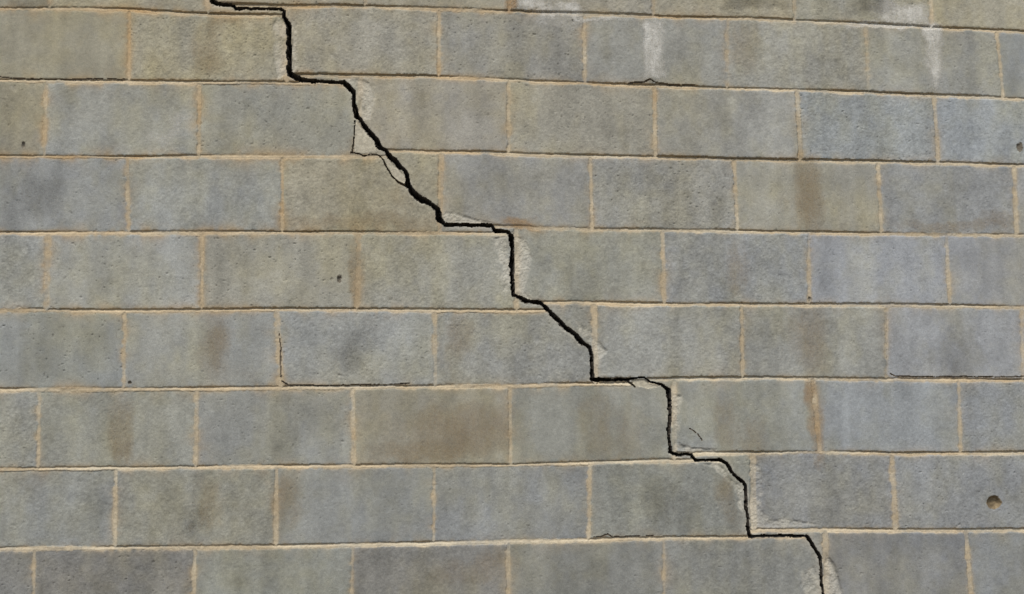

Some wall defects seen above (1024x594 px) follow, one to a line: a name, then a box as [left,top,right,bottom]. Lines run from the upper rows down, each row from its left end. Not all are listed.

crack [209,0,825,594]